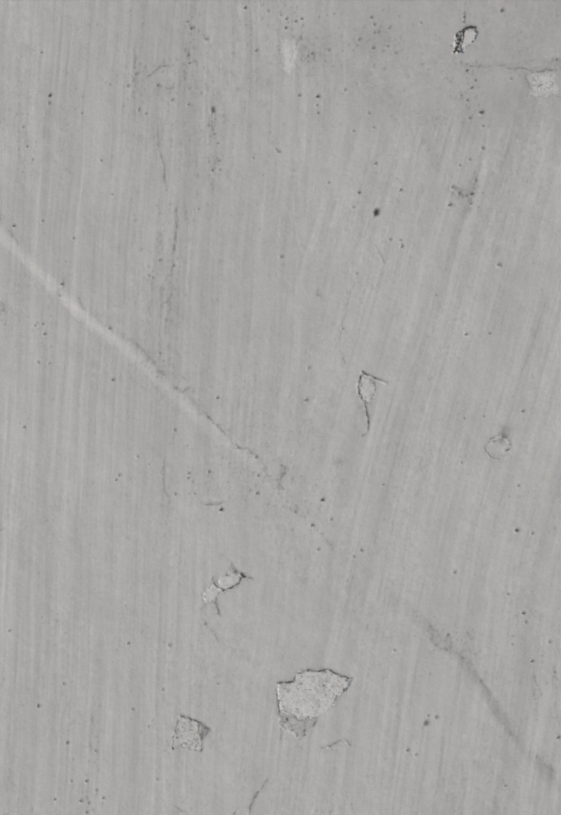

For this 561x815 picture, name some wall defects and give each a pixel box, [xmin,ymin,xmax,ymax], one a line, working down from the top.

spalling [454,26,478,53]
peeling [525,68,561,99]
spalling [202,571,250,605]
spalling [276,669,353,735]
spalling [172,716,209,751]